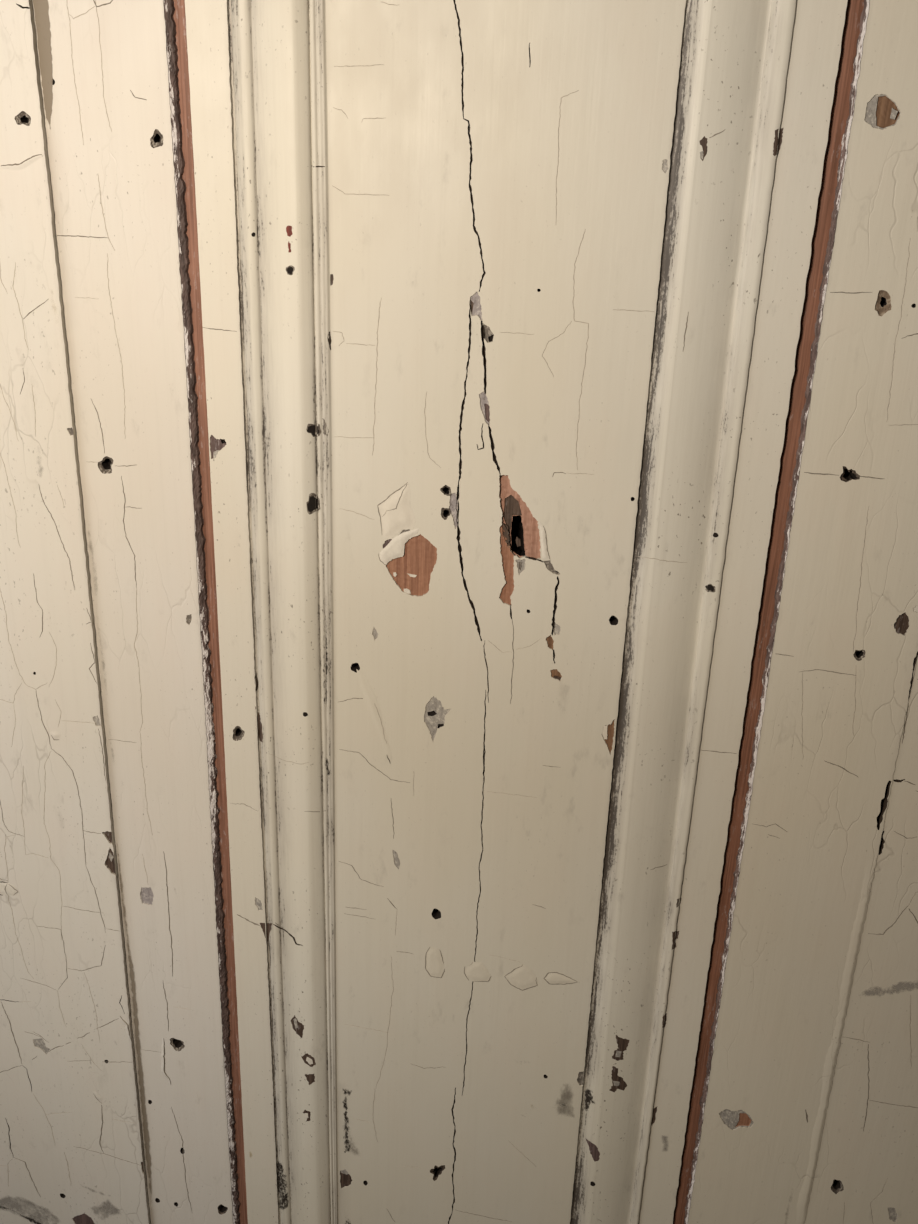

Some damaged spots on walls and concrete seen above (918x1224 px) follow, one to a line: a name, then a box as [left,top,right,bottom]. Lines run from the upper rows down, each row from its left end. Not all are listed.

crack [67,0,113,145]
crack [1,154,42,170]
crack [328,298,382,456]
peeling [378,528,437,596]
crack [339,0,589,1224]
spalling [499,475,559,606]
spalling [684,0,901,1224]
crack [0,175,192,1211]
peeling [424,696,451,742]
crack [902,652,918,743]
crack [876,779,918,855]
peeling [72,1213,94,1224]